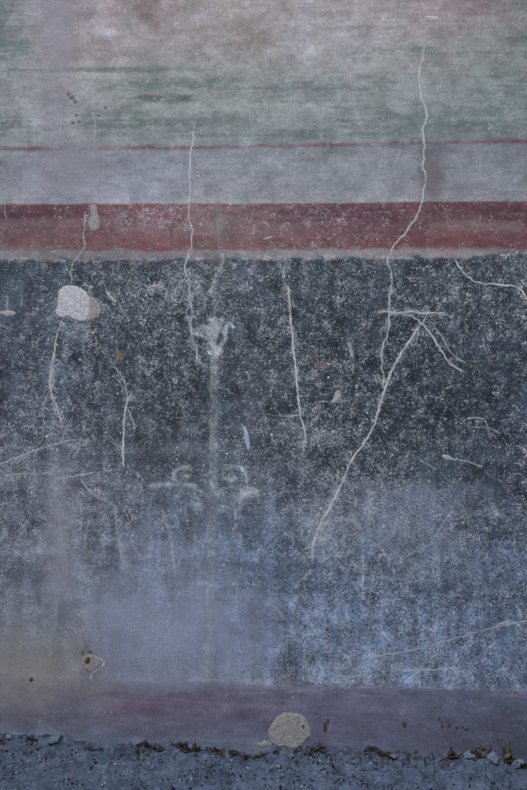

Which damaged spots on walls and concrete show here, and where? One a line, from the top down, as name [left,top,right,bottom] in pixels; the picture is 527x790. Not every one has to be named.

crack [49,321,62,421]
crack [184,128,198,359]
crack [283,273,307,438]
crack [311,49,464,559]
crack [455,261,527,300]